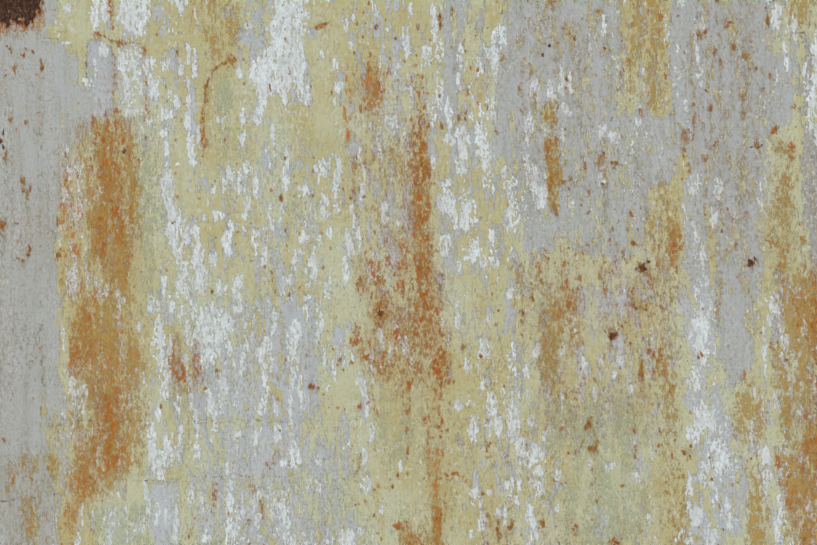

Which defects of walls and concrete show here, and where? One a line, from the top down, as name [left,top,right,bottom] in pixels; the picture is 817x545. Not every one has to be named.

rust [0,0,43,33]
peeling [165,0,188,18]
peeling [331,58,359,116]
rust [342,52,391,142]
rust [533,92,572,213]
peeling [107,273,127,332]
rust [337,73,464,545]
rust [598,252,665,318]
peeling [355,370,376,466]
peeling [462,456,488,545]
peeling [572,340,605,413]
rust [779,376,817,542]